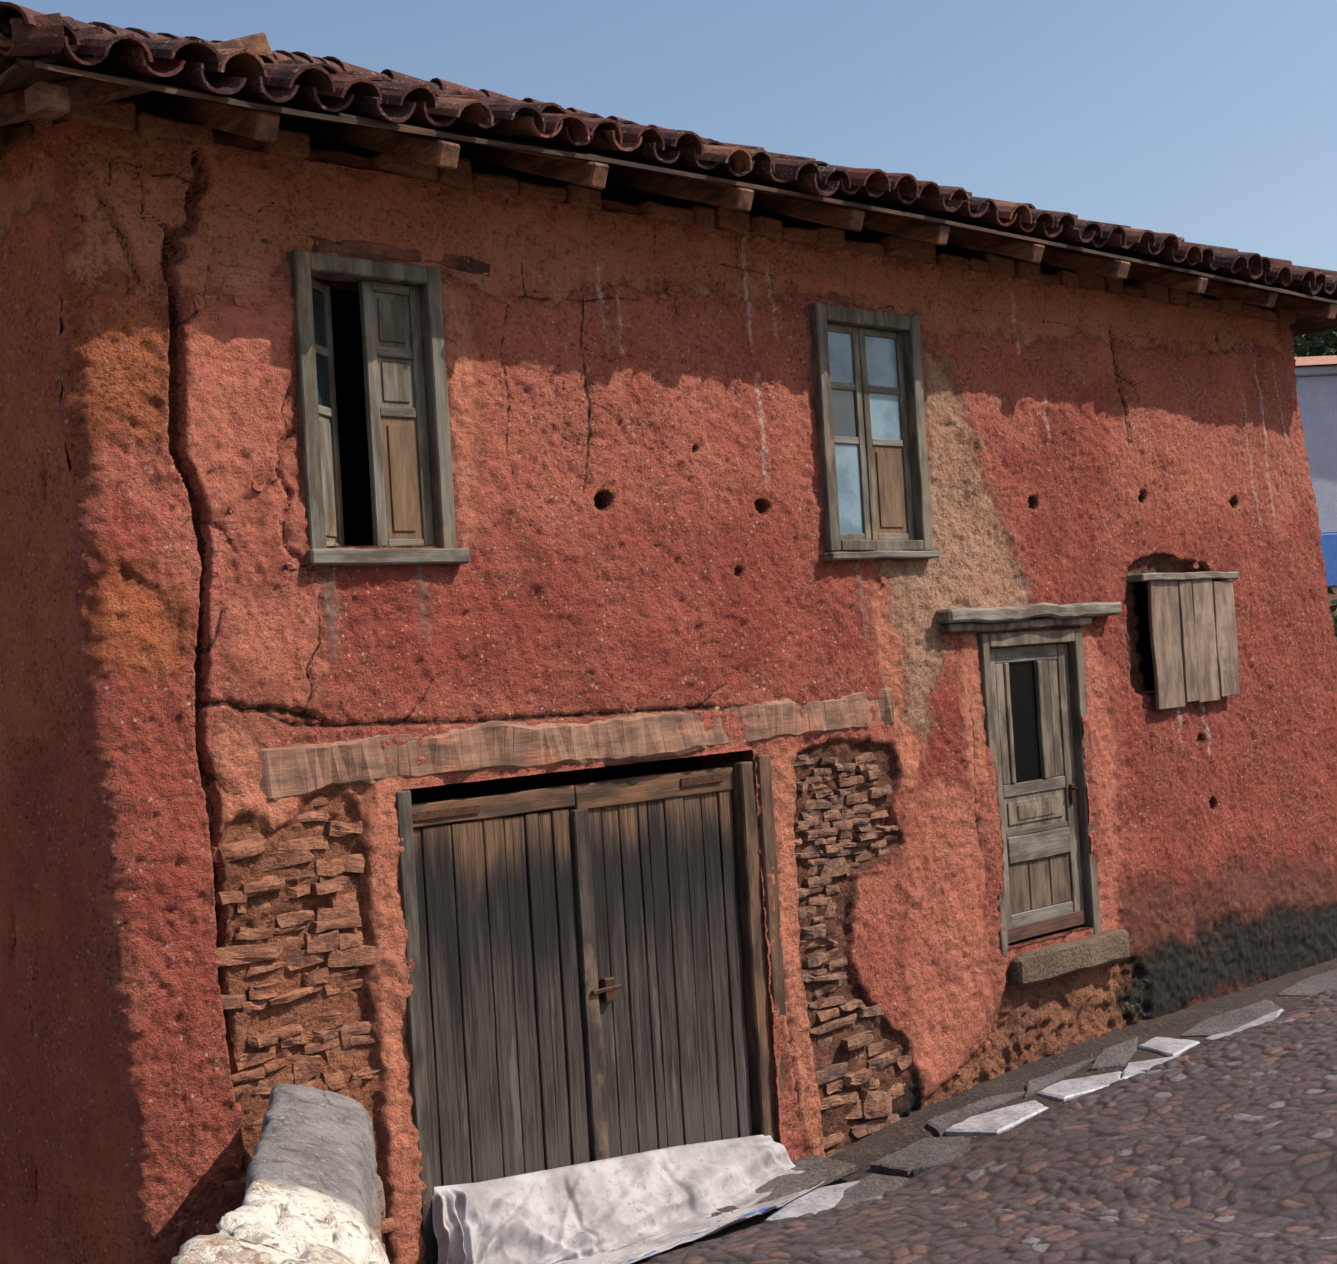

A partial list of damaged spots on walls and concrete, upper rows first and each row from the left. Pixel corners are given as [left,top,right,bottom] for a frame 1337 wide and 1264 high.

crack [87,151,731,1041]
peeling [60,125,1284,710]
crack [705,248,778,290]
crack [927,291,1248,445]
spalling [210,785,386,1195]
spalling [794,576,1153,1158]
water stain [1116,858,1337,1026]
spalling [381,1205,396,1255]